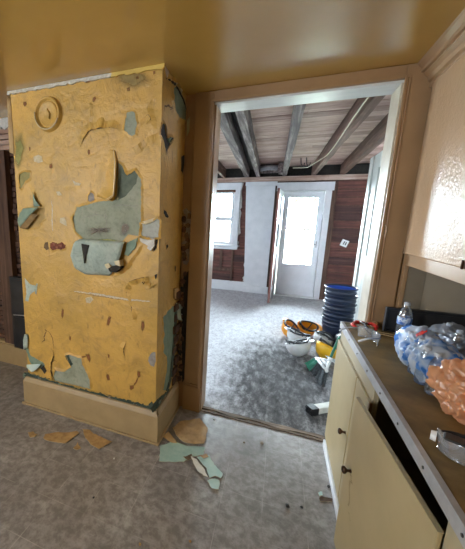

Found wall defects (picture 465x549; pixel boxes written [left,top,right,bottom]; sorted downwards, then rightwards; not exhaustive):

peeling [122,109,139,139]
spalling [161,124,173,152]
peeling [164,66,190,135]
peeling [18,195,47,231]
peeling [44,150,169,277]
flaking render [22,207,191,412]